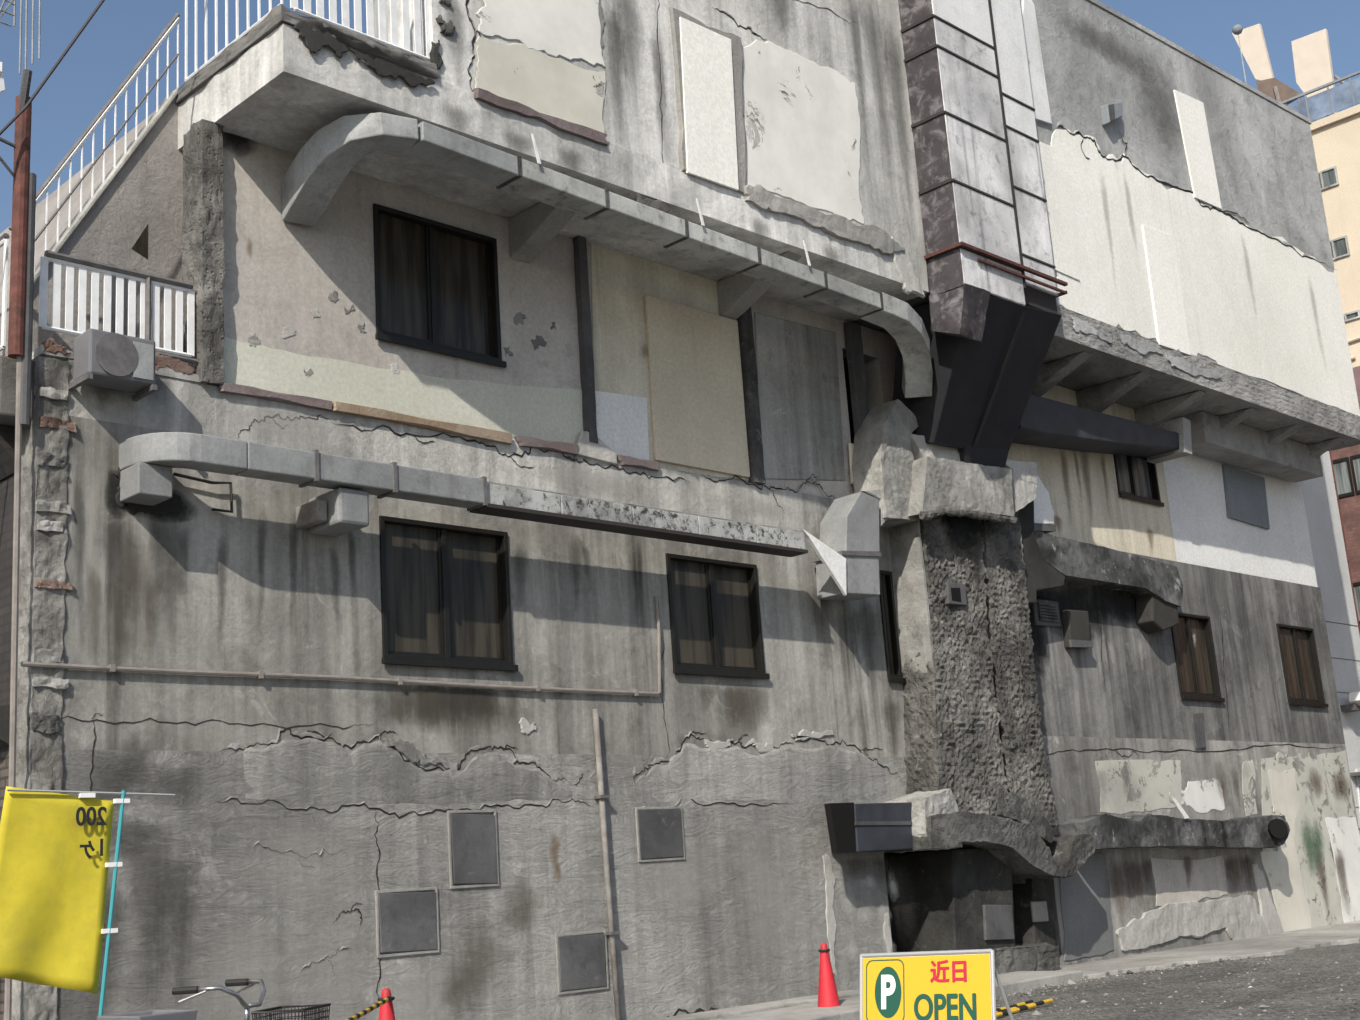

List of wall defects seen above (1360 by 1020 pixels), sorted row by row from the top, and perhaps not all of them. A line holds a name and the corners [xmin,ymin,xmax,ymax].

peeling [294,0,456,88]
peeling [474,0,606,133]
peeling [742,40,905,256]
peeling [248,333,261,348]
peeling [310,290,367,333]
peeling [531,322,556,368]
spalling [1072,317,1222,379]
crack [238,413,835,509]
peeling [1095,760,1225,814]
crack [61,713,591,997]
peeling [1115,750,1360,952]